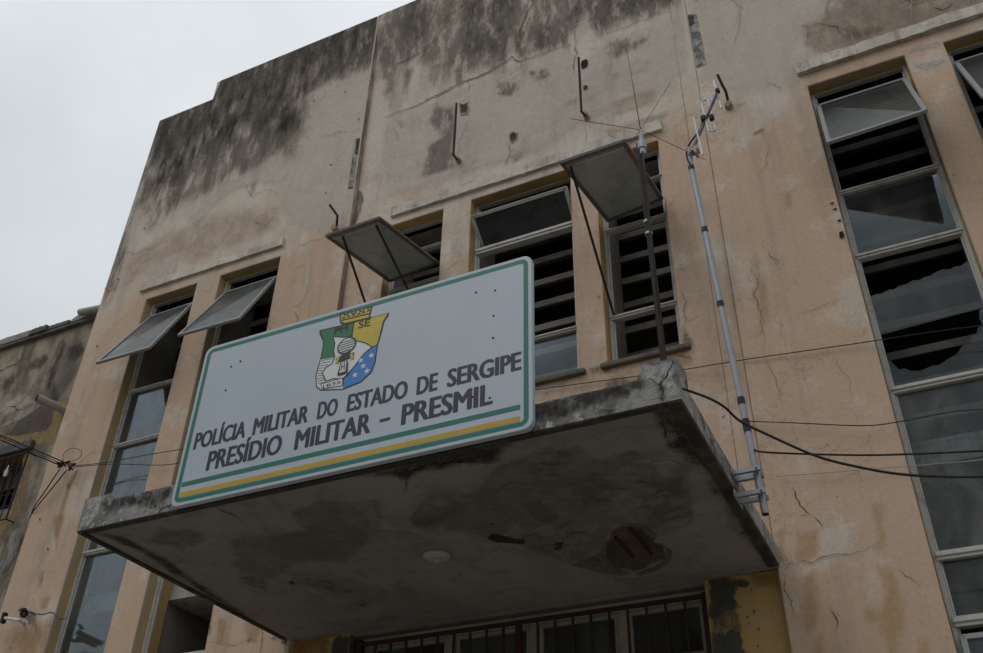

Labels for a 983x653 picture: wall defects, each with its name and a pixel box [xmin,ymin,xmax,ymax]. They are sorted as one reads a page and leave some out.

water stain [135,0,671,225]
crack [383,0,670,117]
water stain [106,232,126,296]
water stain [337,256,348,311]
crack [645,268,705,468]
spalling [573,523,672,577]